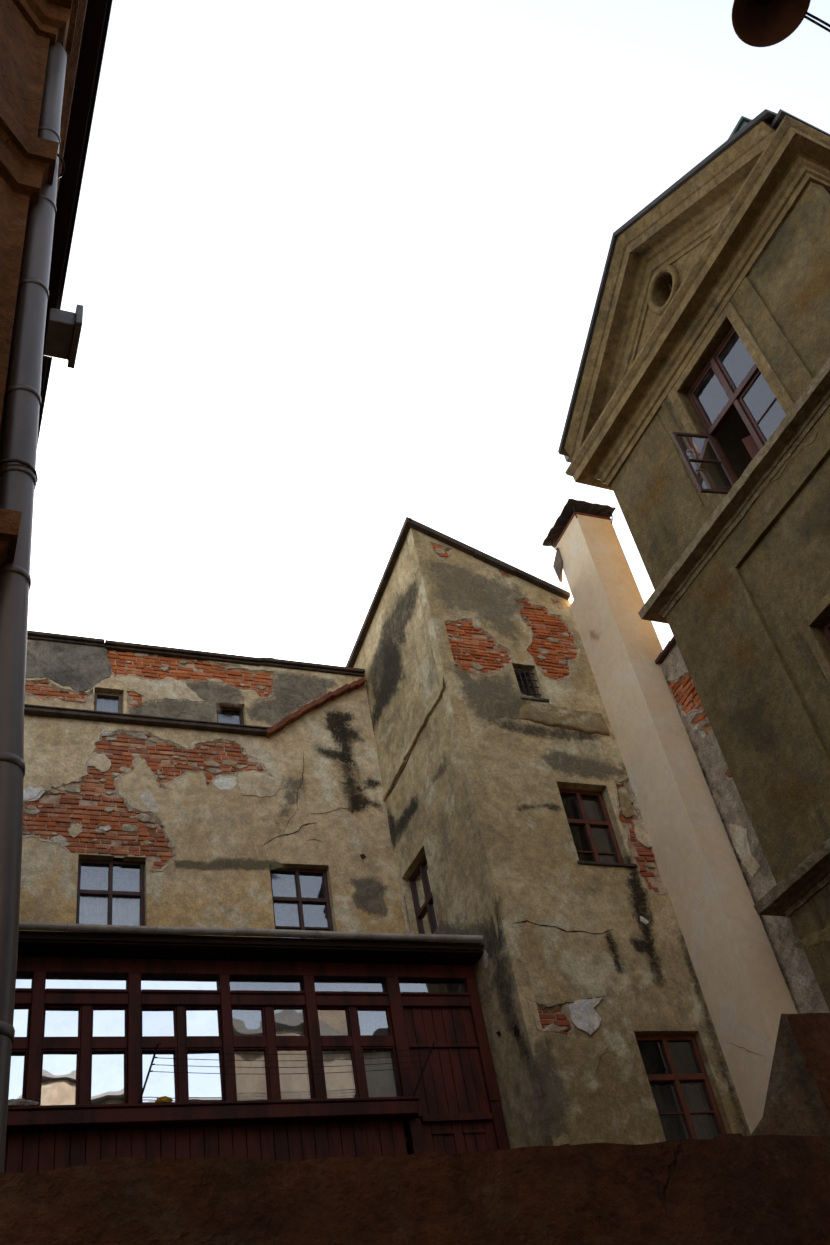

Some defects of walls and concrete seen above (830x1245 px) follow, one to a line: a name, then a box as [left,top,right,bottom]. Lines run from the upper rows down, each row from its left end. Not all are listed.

spalling [436,597,581,683]
spalling [25,678,102,710]
spalling [104,643,276,709]
spalling [667,671,712,739]
spalling [22,729,273,874]
crack [262,756,357,846]
spalling [611,777,668,896]
crack [511,920,613,934]
spalling [525,996,604,1037]